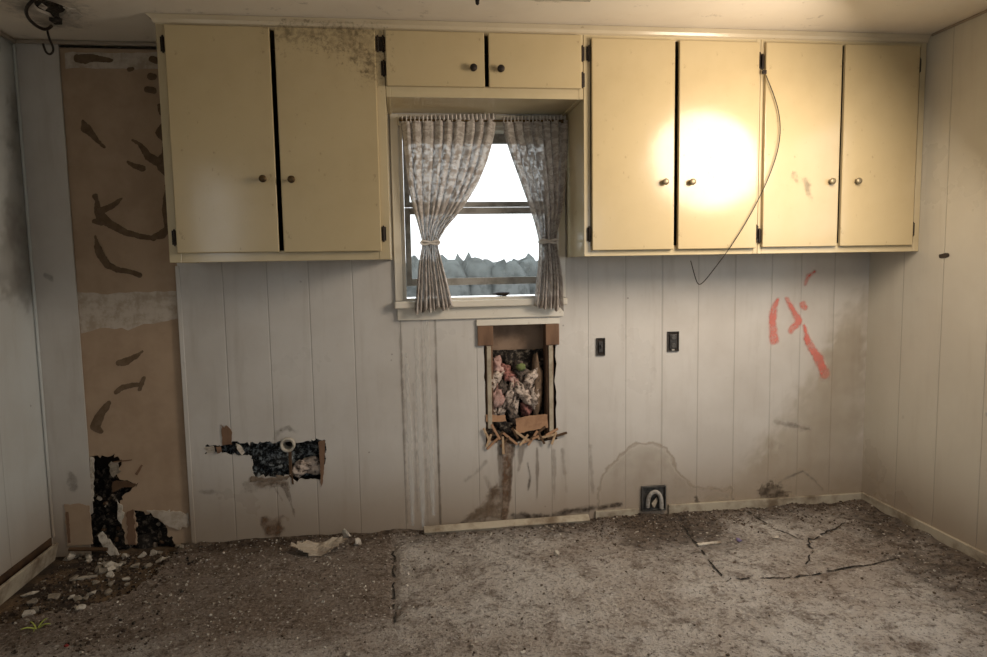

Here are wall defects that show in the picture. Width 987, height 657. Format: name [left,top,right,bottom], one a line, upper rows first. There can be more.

spalling [476,318,567,454]
spalling [64,457,190,556]
spalling [204,425,326,486]
damp [473,440,549,520]
damp [561,503,622,515]
crack [682,511,898,582]